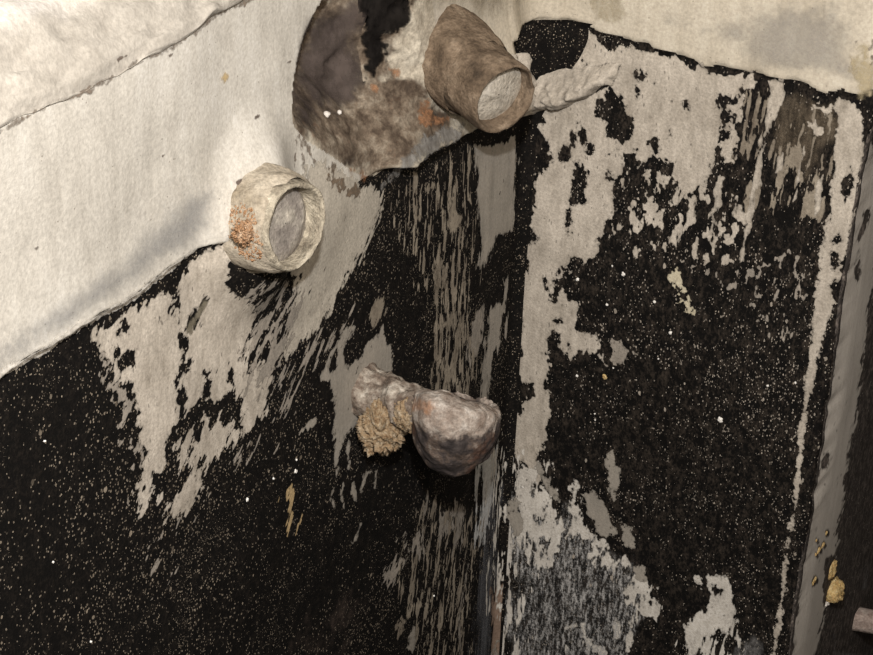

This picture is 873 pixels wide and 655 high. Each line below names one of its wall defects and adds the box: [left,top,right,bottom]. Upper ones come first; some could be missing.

corrosion [228,203,263,262]
peeling [90,0,520,576]
peeling [514,28,873,655]
peeling [382,490,493,655]
peeling [507,497,523,536]